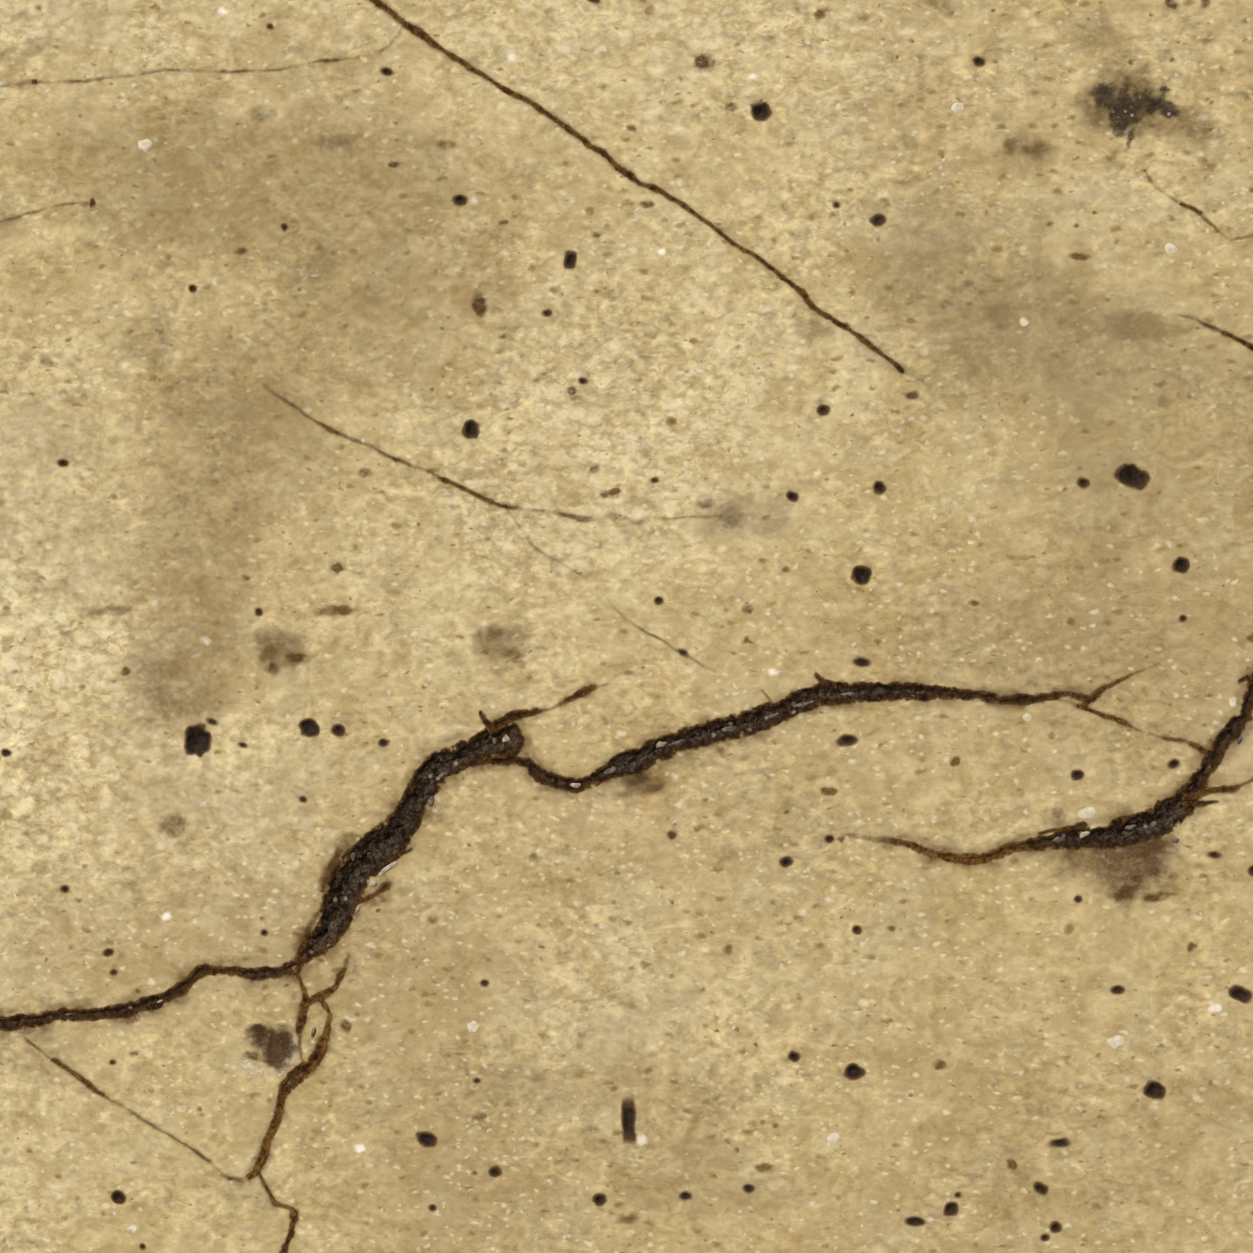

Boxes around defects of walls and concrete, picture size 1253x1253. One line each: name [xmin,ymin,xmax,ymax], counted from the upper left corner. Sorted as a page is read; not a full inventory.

crack [369,0,904,373]
crack [316,421,358,441]
crack [433,473,516,509]
crack [1202,323,1253,351]
crack [879,673,1253,865]
crack [0,673,1131,1253]